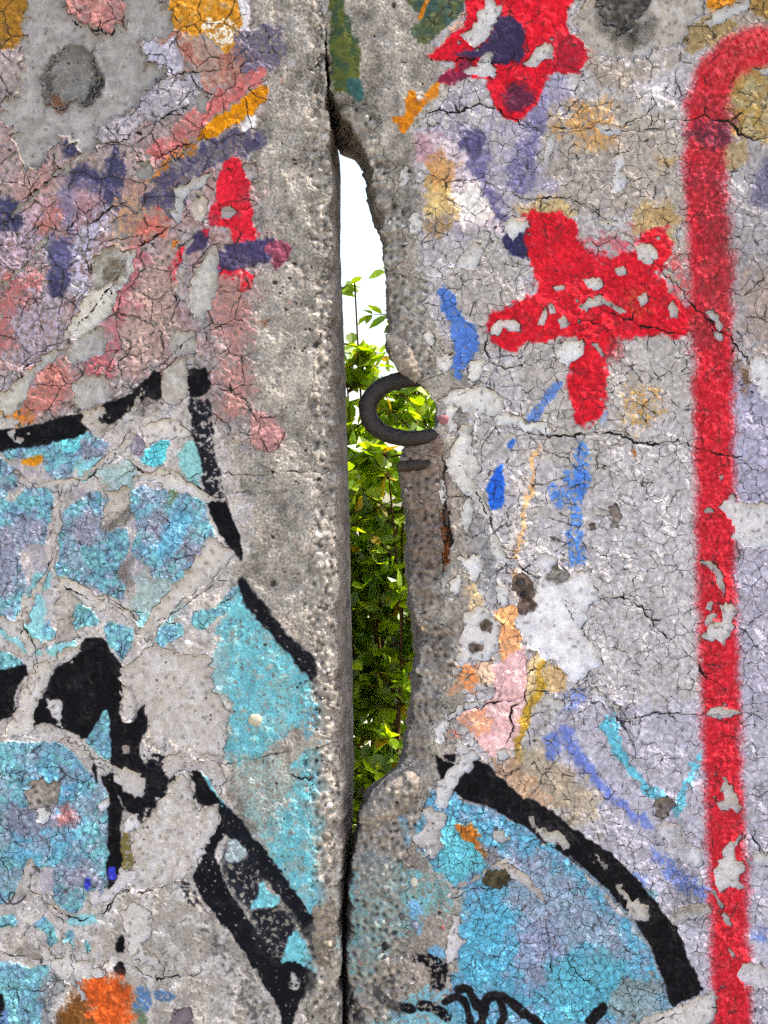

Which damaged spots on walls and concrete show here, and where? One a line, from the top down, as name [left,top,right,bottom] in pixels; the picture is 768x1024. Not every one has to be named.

crack [421,89,768,141]
crack [2,54,251,386]
peeling [599,220,660,265]
peeling [538,277,627,368]
crack [587,269,750,364]
crack [454,334,767,475]
rust [441,464,450,571]
spalling [298,0,603,1024]
peeling [704,494,768,549]
peeling [698,561,737,646]
peeling [0,419,235,970]
crack [457,662,550,746]